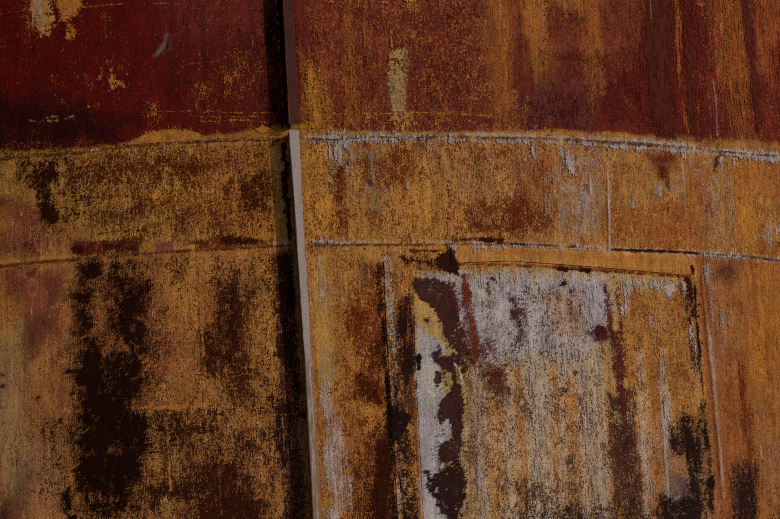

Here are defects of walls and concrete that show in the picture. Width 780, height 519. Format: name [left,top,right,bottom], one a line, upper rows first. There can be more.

peeling [15,0,87,44]
peeling [387,30,418,133]
corrosion [14,138,306,519]
corrosion [339,256,432,519]
peeling [413,273,492,519]
corrosion [400,195,542,489]
corrosion [516,443,586,519]
corrosion [548,265,719,519]
corrosion [730,362,767,519]